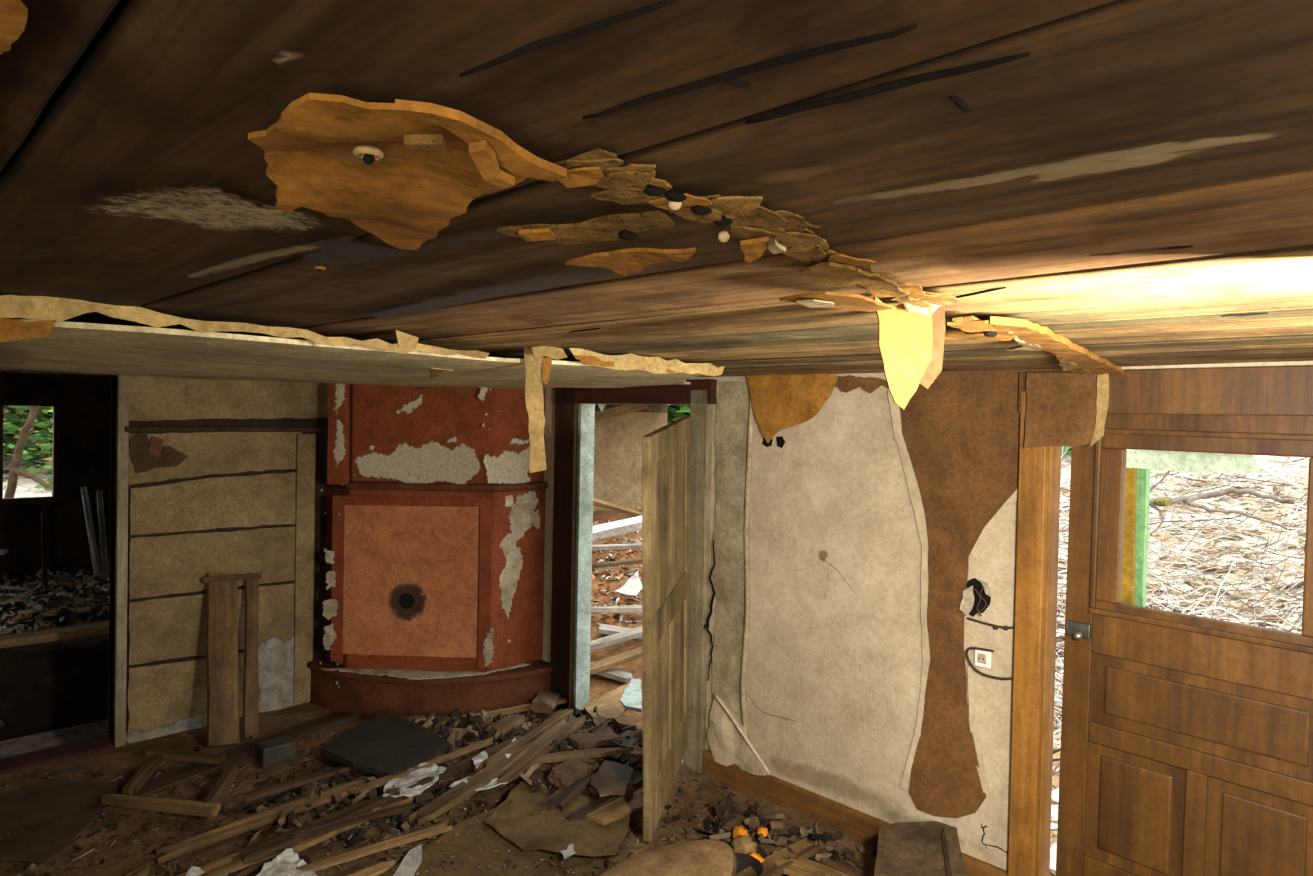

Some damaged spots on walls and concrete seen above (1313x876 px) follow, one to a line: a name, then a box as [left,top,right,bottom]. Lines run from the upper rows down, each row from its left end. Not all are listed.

spalling [762,436,785,448]
peeling [333,384,546,619]
peeling [320,548,338,665]
peeling [483,628,511,667]
crack [703,540,716,682]
hole [960,578,992,617]